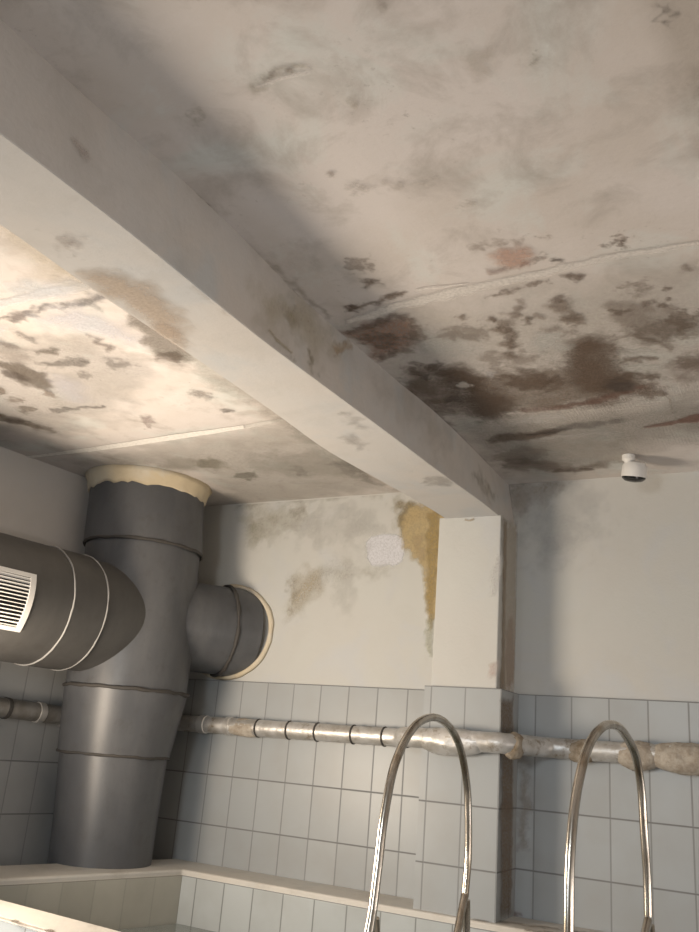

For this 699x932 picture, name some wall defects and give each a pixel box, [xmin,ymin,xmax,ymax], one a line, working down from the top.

damp [131,318,186,361]
damp [0,363,52,395]
damp [410,338,668,441]
damp [0,414,42,429]
damp [399,503,444,622]
rust [502,701,513,733]
rust [500,754,513,923]